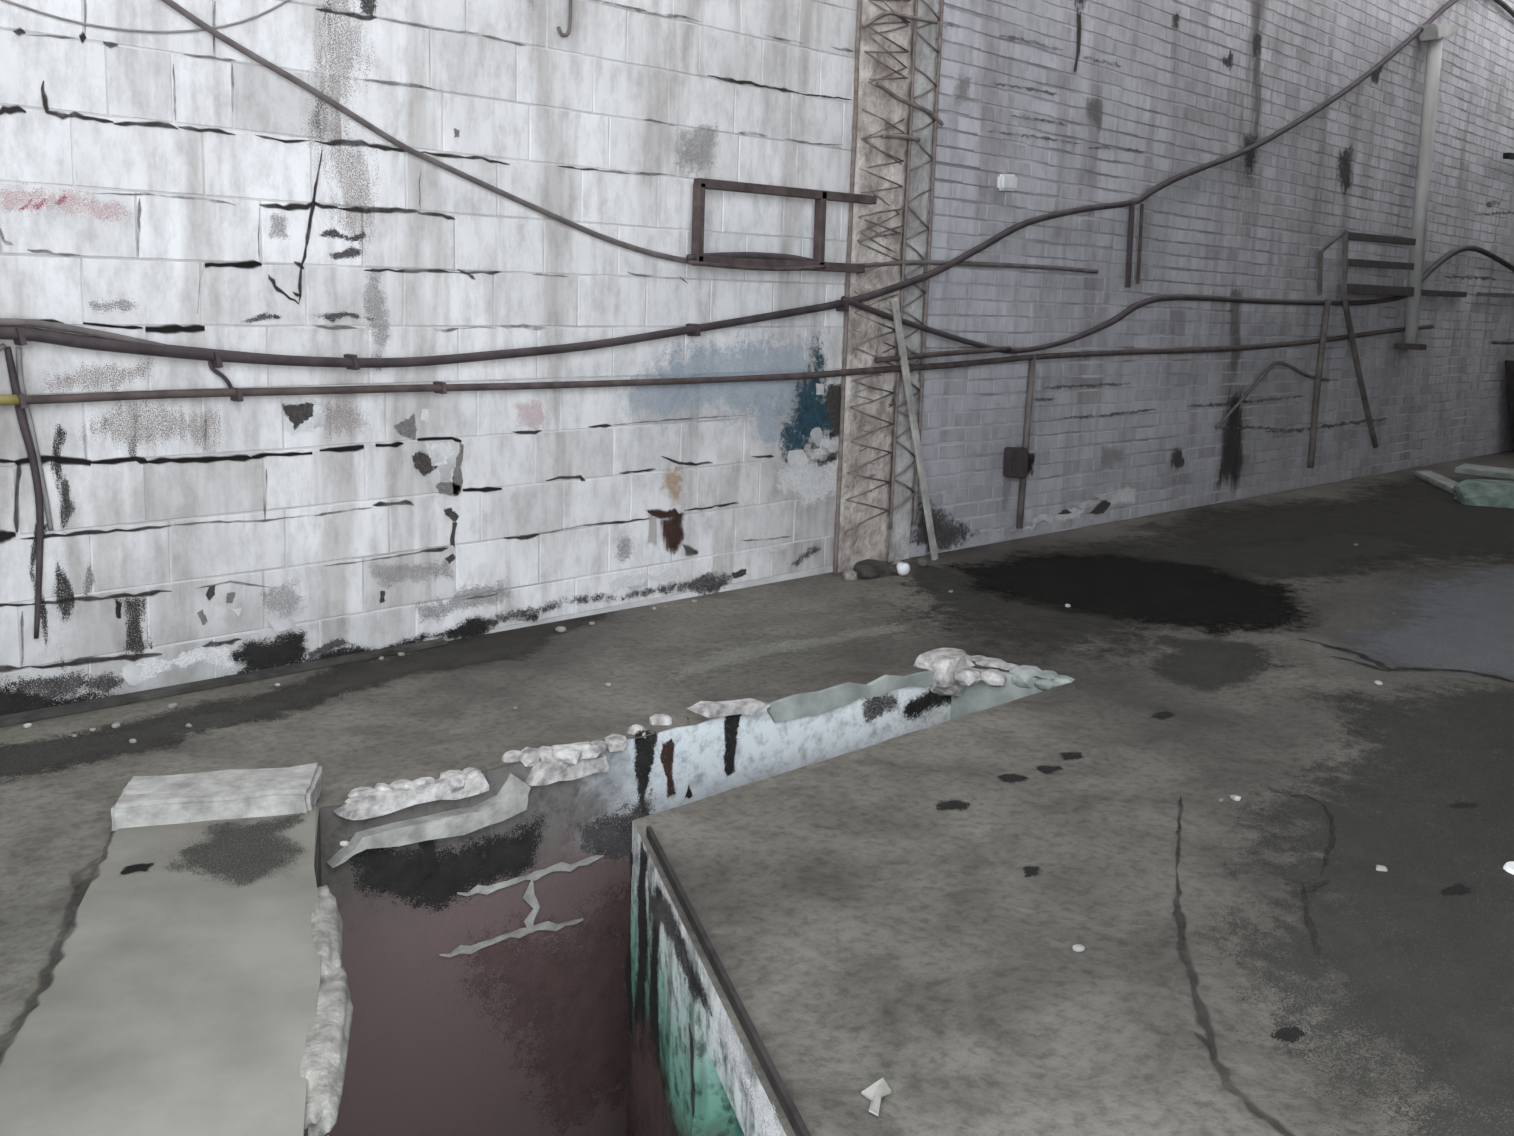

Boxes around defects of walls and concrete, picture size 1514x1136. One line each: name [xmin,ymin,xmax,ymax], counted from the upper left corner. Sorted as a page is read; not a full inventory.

crack [0,0,525,329]
damp [284,0,392,374]
crack [364,269,567,280]
damp [613,310,835,463]
damp [0,400,229,716]
crack [0,581,267,672]
crack [0,437,462,539]
damp [208,552,734,678]
crack [504,518,650,540]
corrosion [645,463,698,557]
damp [333,718,693,1136]
spalling [304,668,1044,1136]